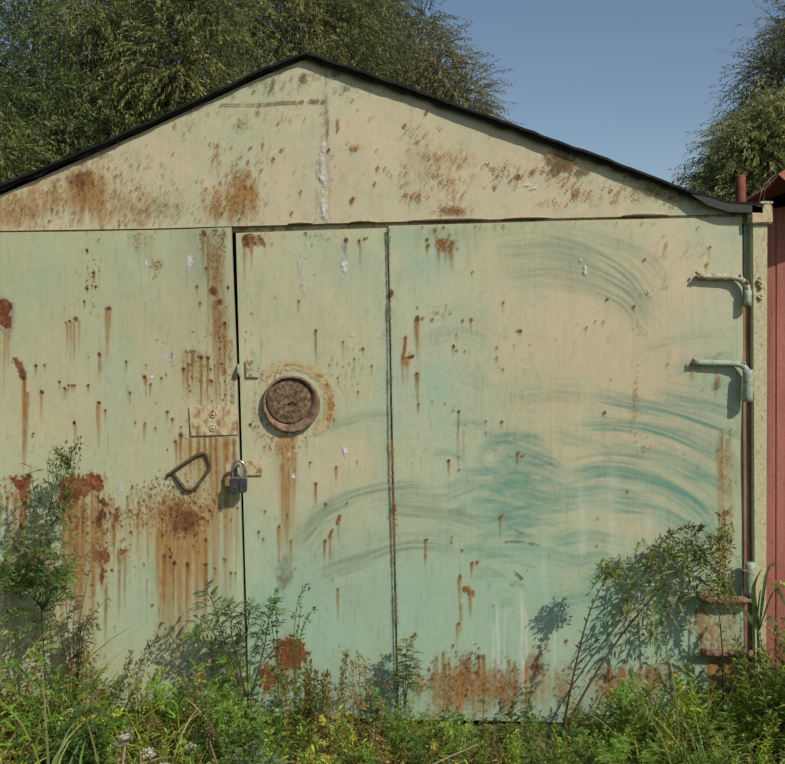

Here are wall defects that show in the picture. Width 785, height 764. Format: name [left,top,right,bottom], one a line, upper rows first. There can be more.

rust [0,159,123,227]
rust [182,143,273,403]
rust [117,410,238,607]
rust [249,360,339,552]
rust [457,574,475,628]